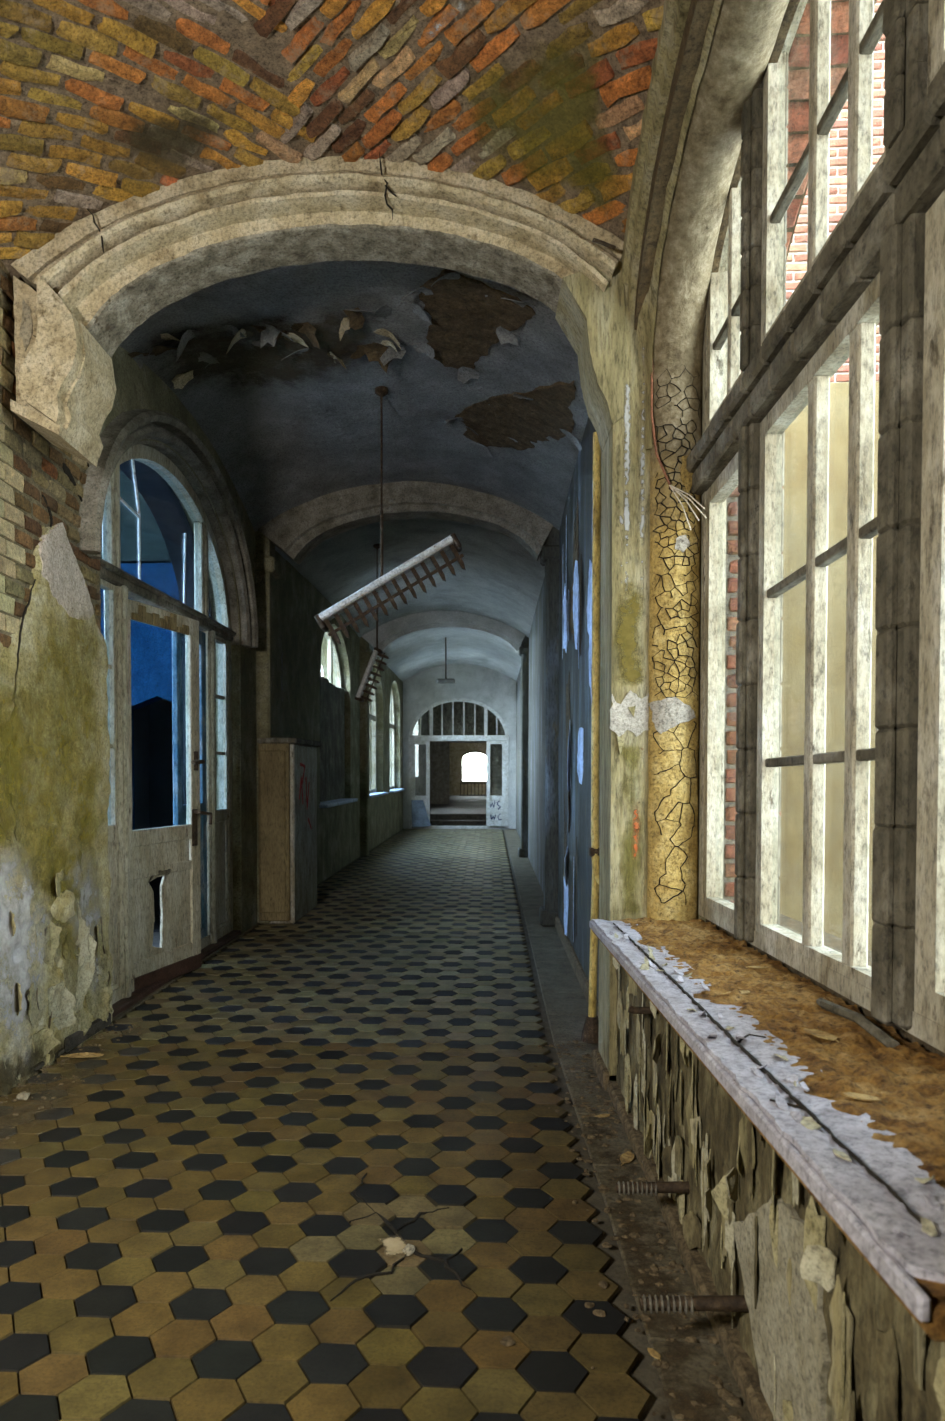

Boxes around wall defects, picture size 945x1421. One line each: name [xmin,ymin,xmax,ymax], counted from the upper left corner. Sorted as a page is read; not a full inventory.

spalling [128,269,535,389]
spalling [444,380,582,458]
spalling [38,523,94,620]
crack [652,365,701,903]
leakage [0,623,99,1024]
peeling [0,869,113,1058]
crack [613,923,921,1224]
crack [330,1173,471,1302]
peeling [609,923,855,1421]
peeling [876,1317,945,1421]